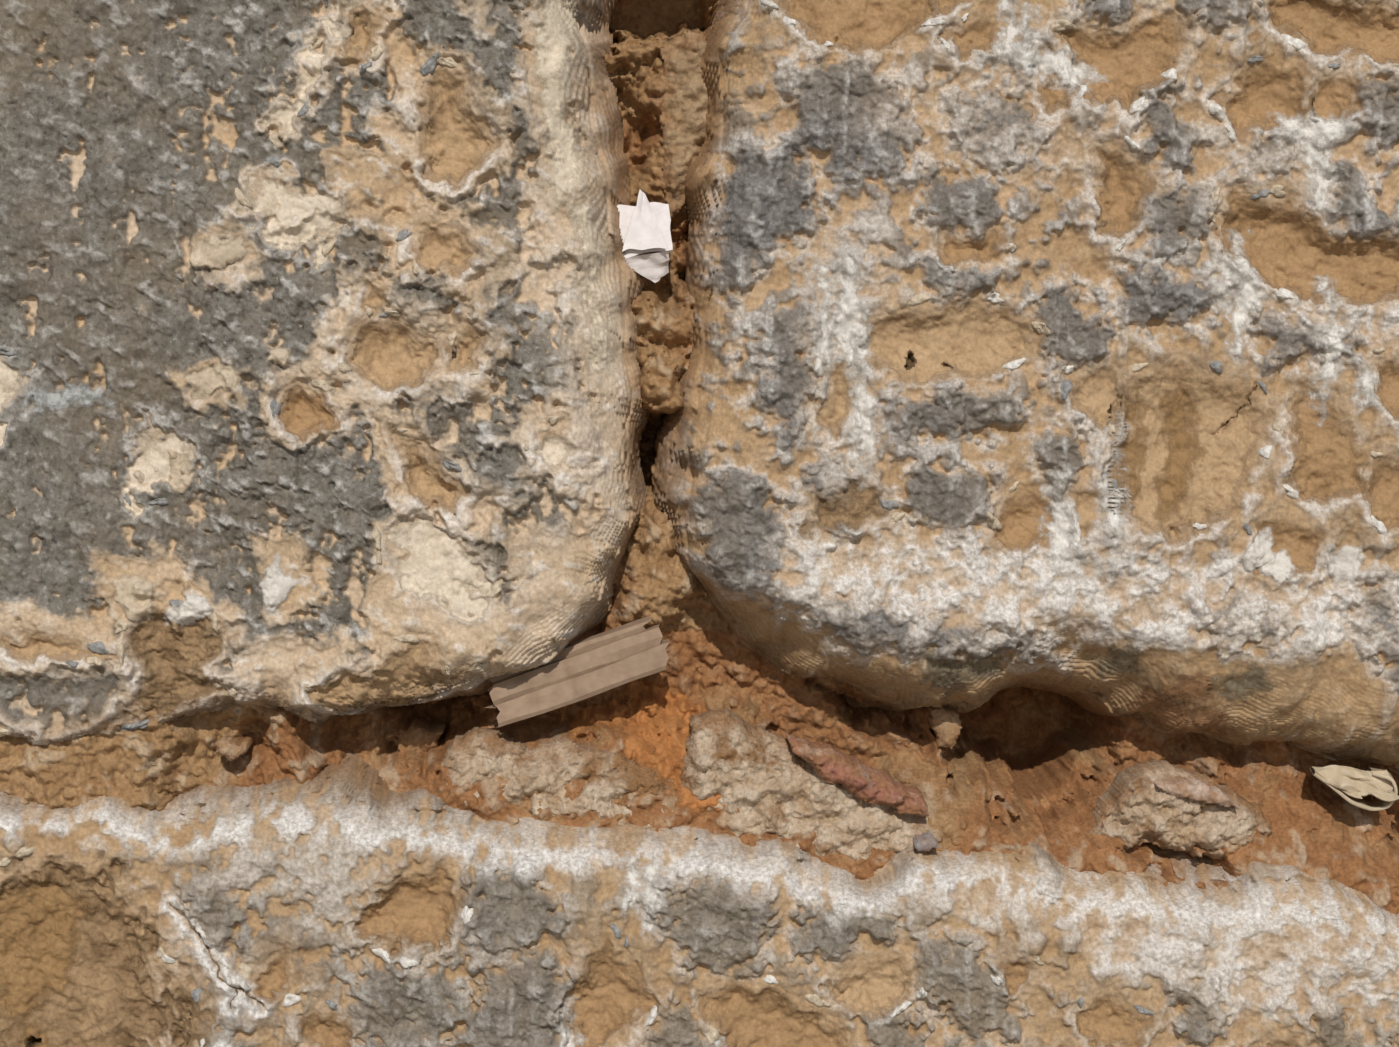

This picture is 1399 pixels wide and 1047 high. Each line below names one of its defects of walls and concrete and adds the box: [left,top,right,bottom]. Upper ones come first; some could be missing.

crack [1217,385,1258,433]